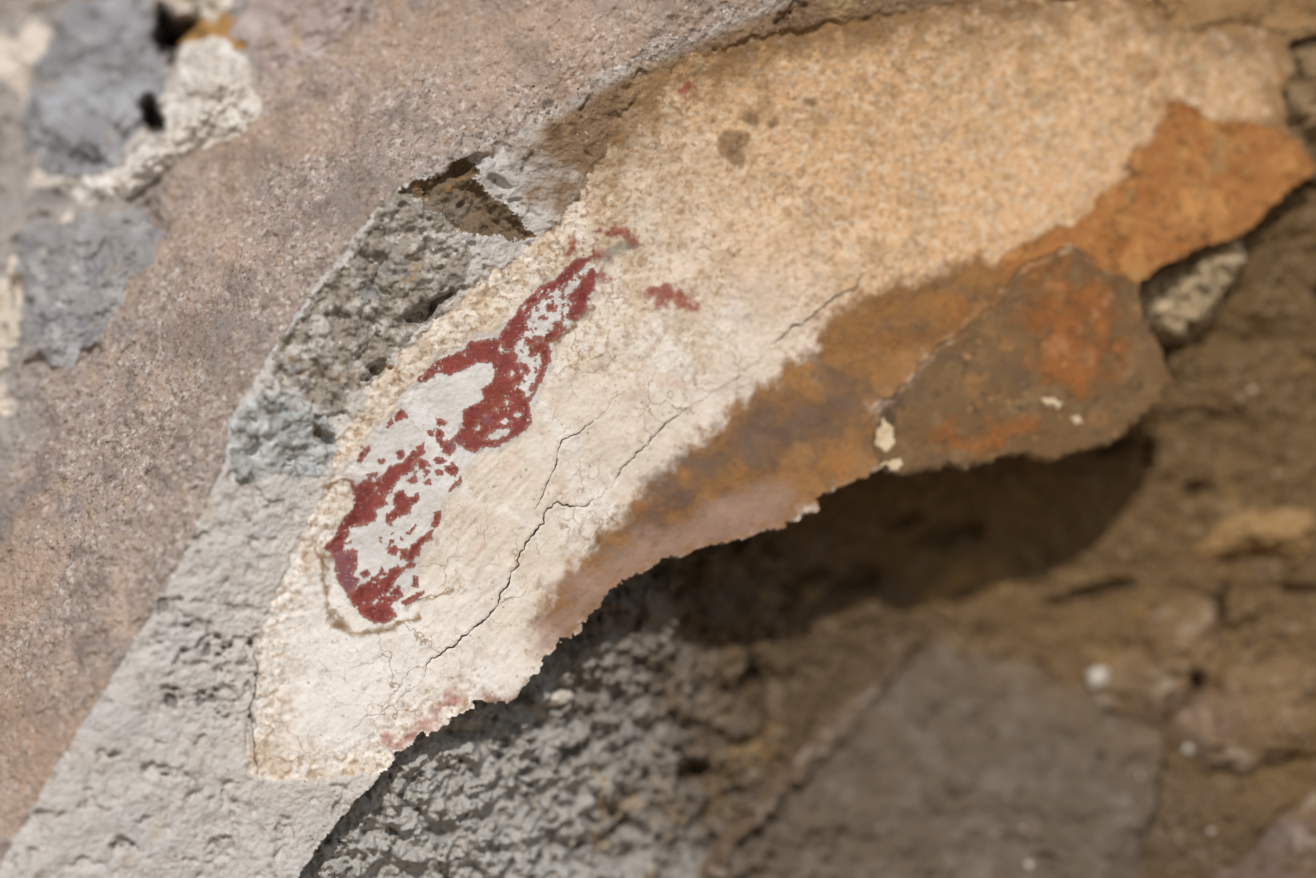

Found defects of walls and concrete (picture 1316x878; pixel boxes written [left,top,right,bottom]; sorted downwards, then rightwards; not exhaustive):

peeling [227,157,598,635]
crack [358,268,877,726]
peeling [875,417,903,471]
peeling [1041,398,1083,424]